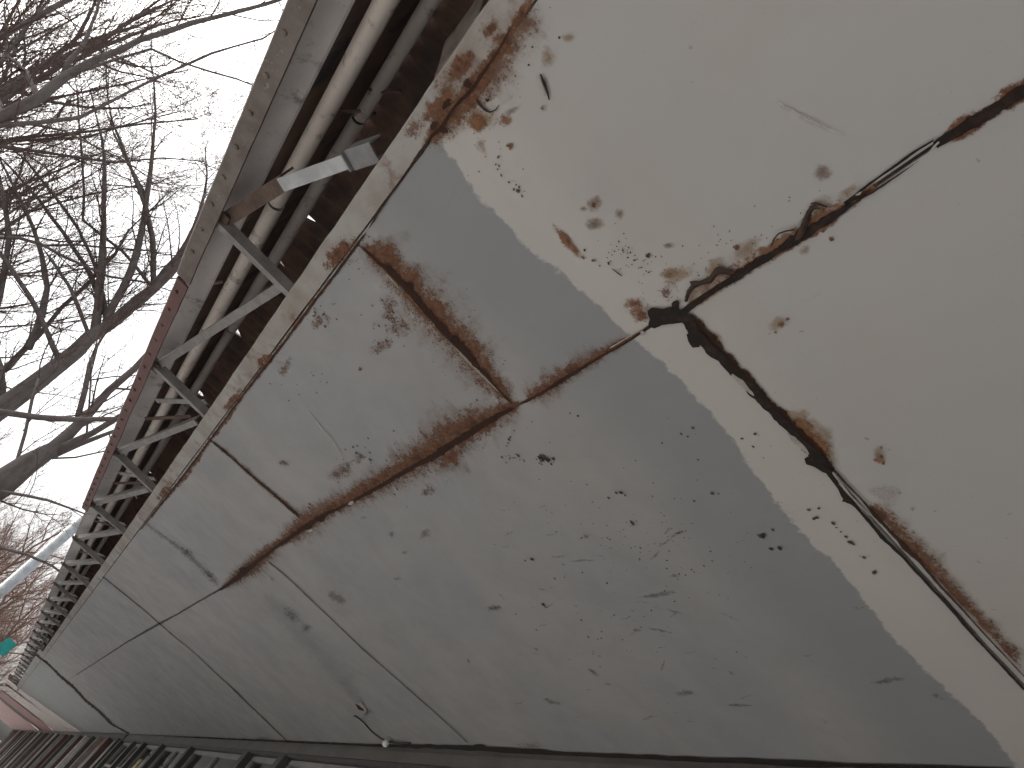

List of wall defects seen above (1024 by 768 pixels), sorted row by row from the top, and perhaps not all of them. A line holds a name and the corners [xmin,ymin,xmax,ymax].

corrosion [141,0,876,590]
crack [671,85,1024,690]
corrosion [870,504,1021,665]
corrosion [943,79,1024,141]